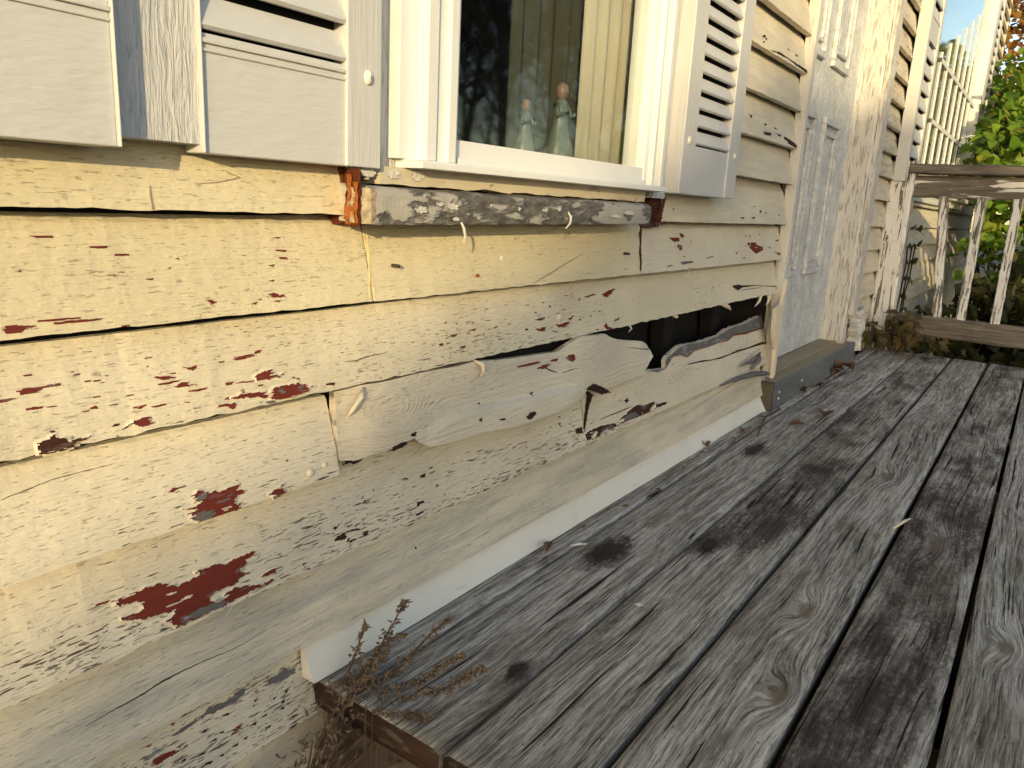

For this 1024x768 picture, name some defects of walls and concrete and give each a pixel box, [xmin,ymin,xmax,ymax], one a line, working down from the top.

peeling [360,168,425,181]
corrosion [343,168,362,228]
peeling [414,202,459,221]
peeling [565,287,616,300]
peeling [525,302,619,333]
peeling [517,354,576,369]
peeling [95,548,277,631]